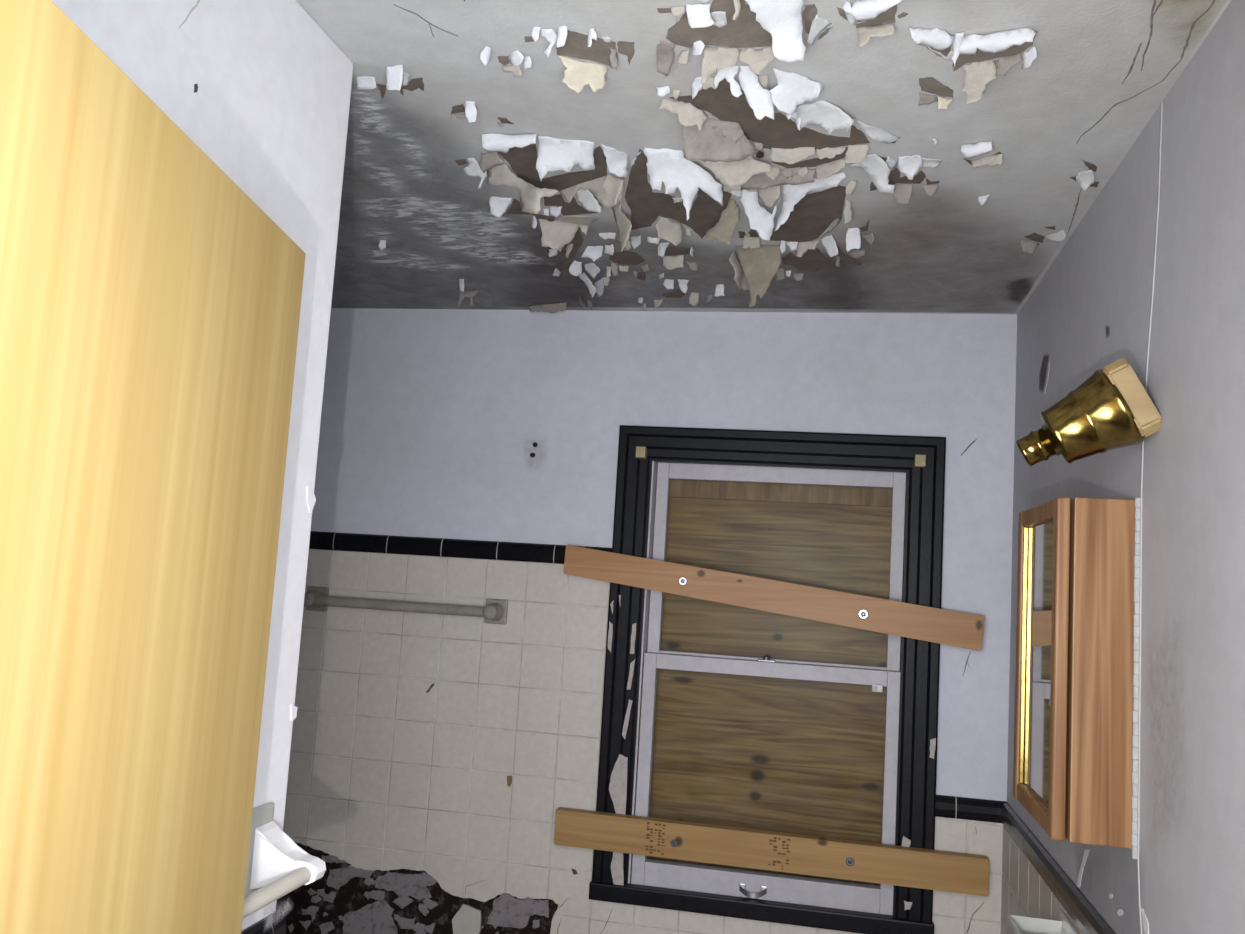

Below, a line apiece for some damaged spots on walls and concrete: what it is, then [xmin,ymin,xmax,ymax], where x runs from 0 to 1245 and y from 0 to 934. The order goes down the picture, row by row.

crack [178,0,200,29]
crack [394,5,458,37]
crack [1076,0,1216,144]
peeling [451,0,1037,313]
damp [333,89,583,310]
crack [1068,188,1082,233]
peeling [608,595,621,652]
peeling [622,623,636,739]
peeling [609,754,628,814]
peeling [611,852,624,886]